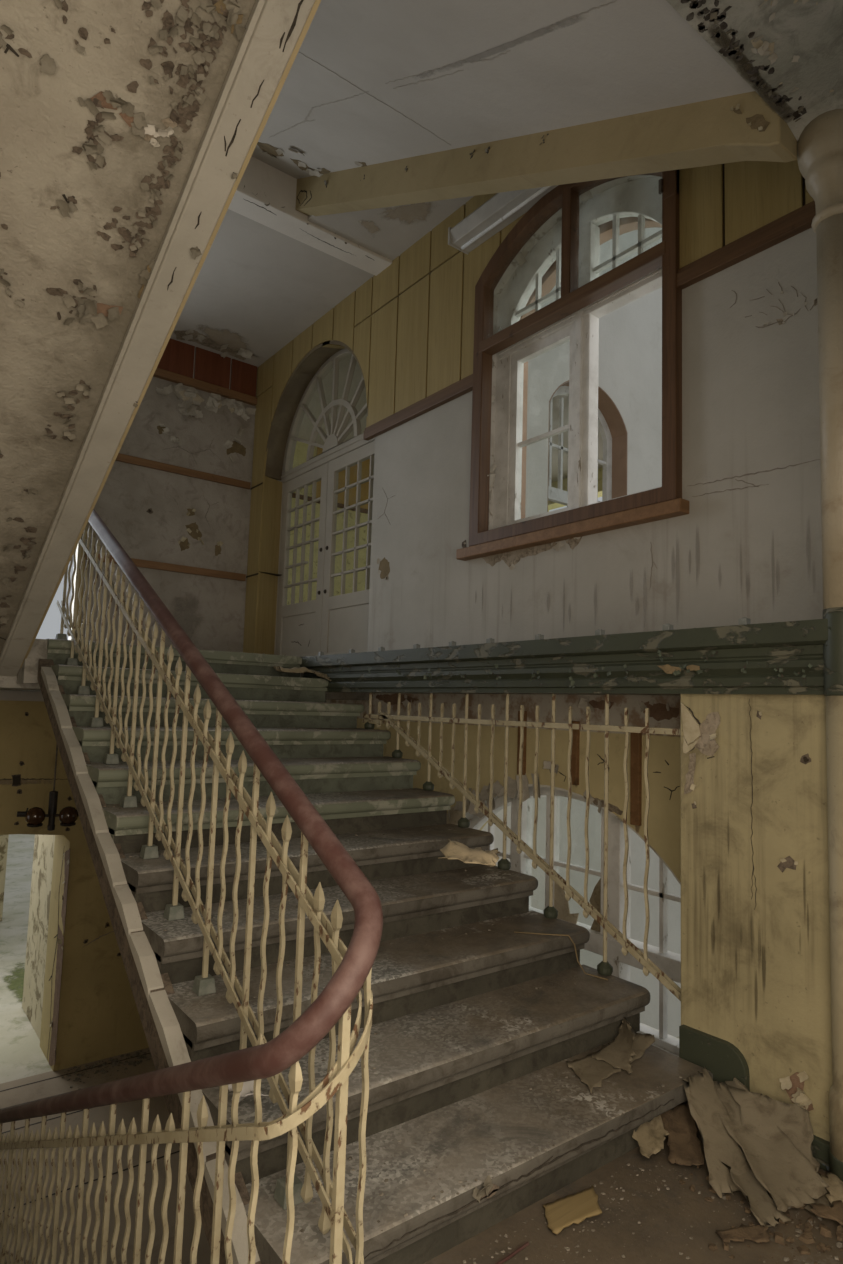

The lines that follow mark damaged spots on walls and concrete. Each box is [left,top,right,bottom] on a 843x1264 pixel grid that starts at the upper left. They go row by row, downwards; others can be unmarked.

peeling [0,24,56,74]
peeling [53,0,88,55]
crack [269,0,511,145]
peeling [72,0,246,299]
crack [224,80,264,157]
peeling [257,142,331,188]
peeling [50,196,78,218]
crack [730,282,817,328]
peeling [44,380,91,442]
peeling [156,383,256,462]
peeling [377,557,390,580]
flaking render [638,699,721,809]